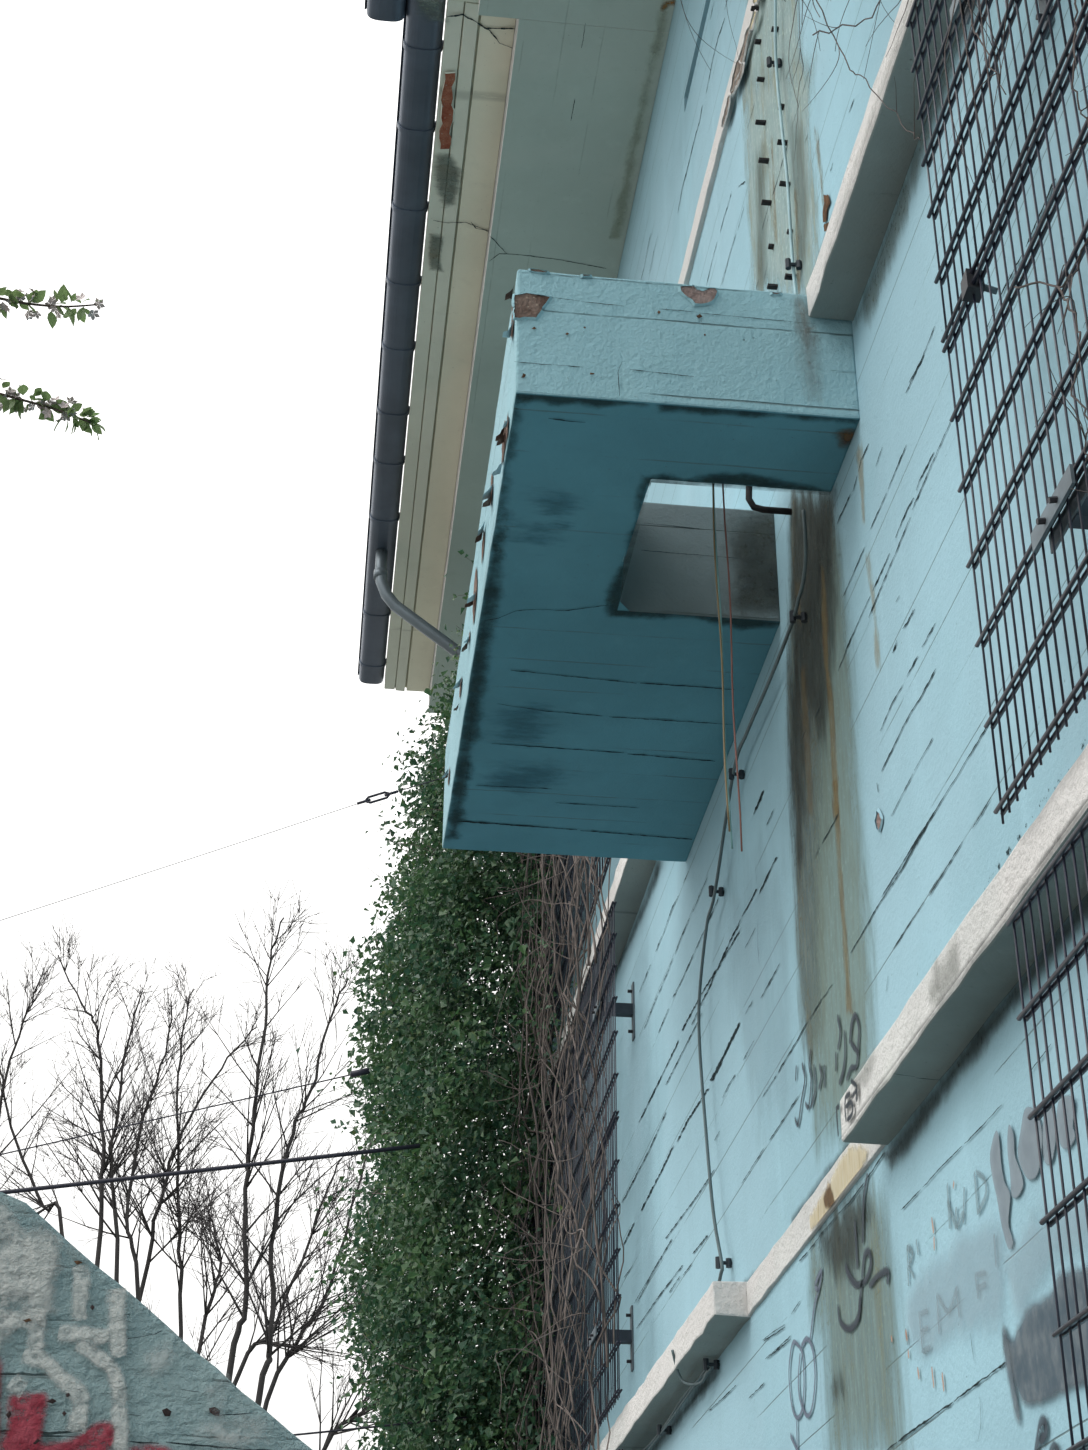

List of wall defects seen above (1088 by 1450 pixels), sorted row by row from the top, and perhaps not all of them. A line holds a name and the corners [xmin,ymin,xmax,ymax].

damp [745,0,817,294]
damp [607,474,883,1135]
damp [932,799,1088,1008]
damp [811,1163,900,1450]